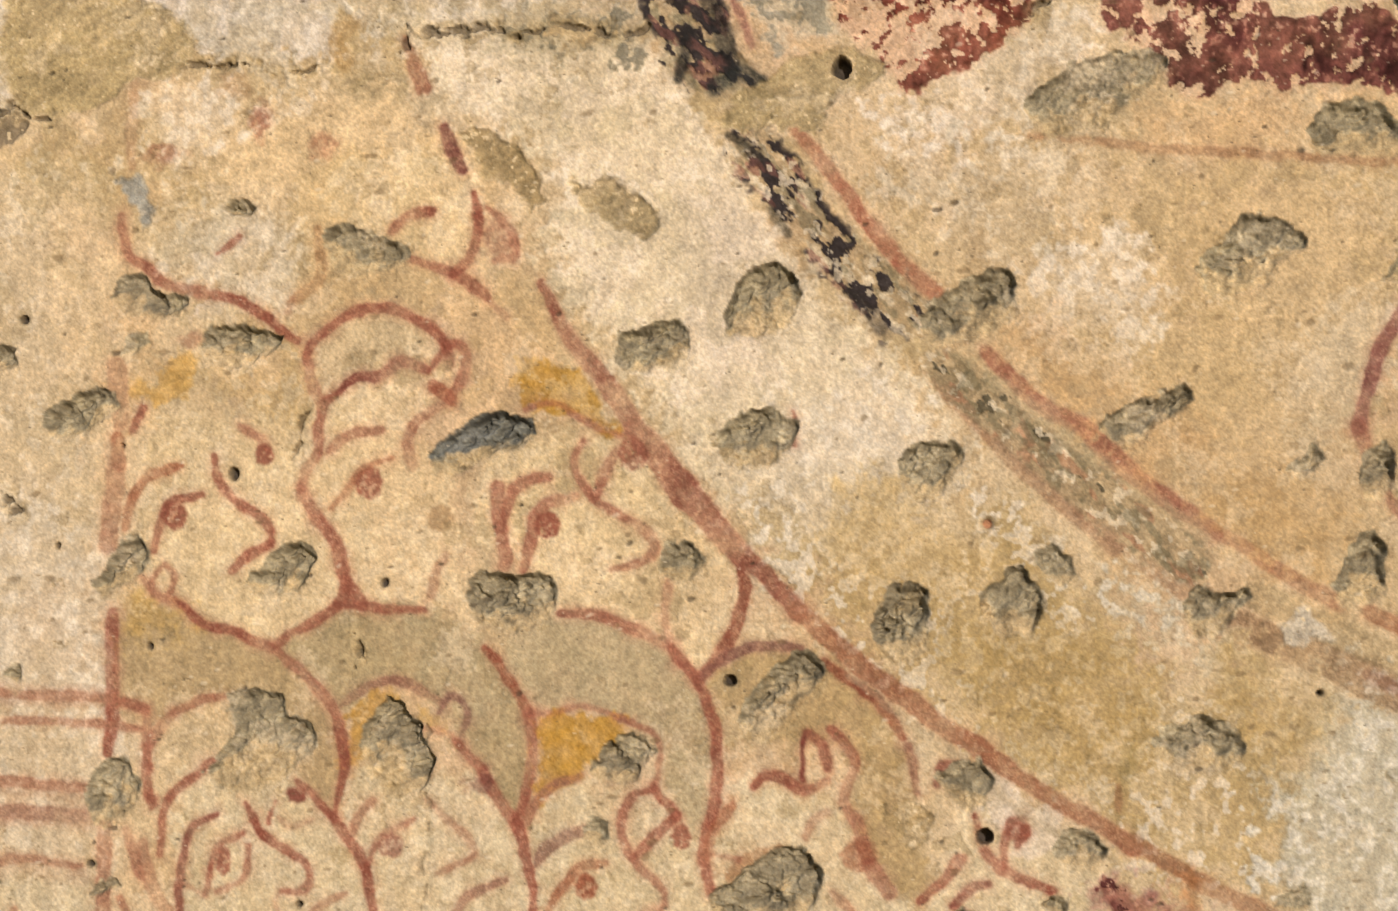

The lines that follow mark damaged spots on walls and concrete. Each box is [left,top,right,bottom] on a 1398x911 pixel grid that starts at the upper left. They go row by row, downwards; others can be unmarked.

crack [0,101,57,127]
peeling [635,0,1216,591]
spalling [1197,248,1305,307]
spalling [622,339,690,377]
spalling [981,606,1041,640]
spalling [211,740,316,797]
spalling [359,742,430,802]
spalling [739,888,821,911]